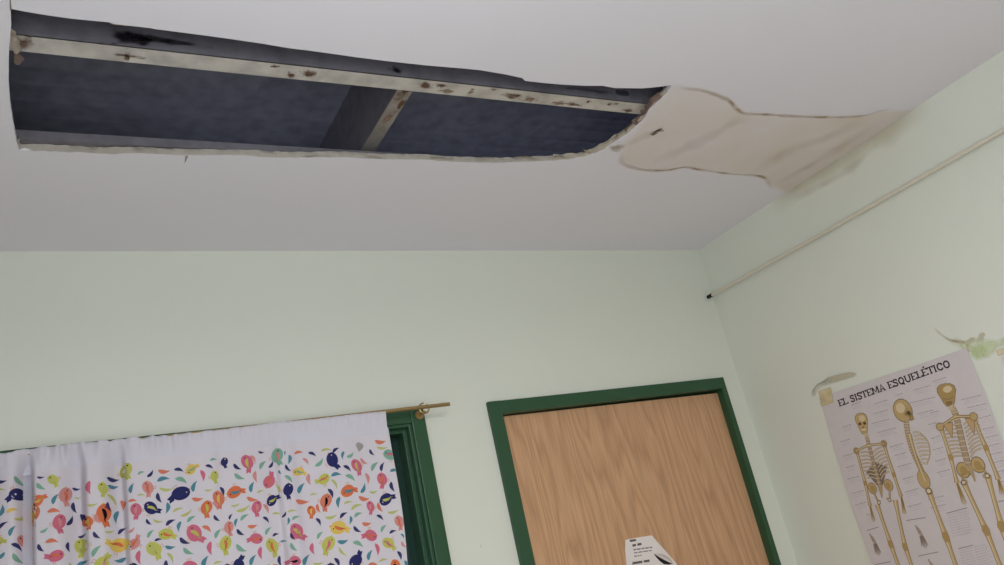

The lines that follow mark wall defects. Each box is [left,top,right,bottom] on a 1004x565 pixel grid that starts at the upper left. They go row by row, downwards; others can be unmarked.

flaking render [17,88,667,163]
water stain [612,82,915,195]